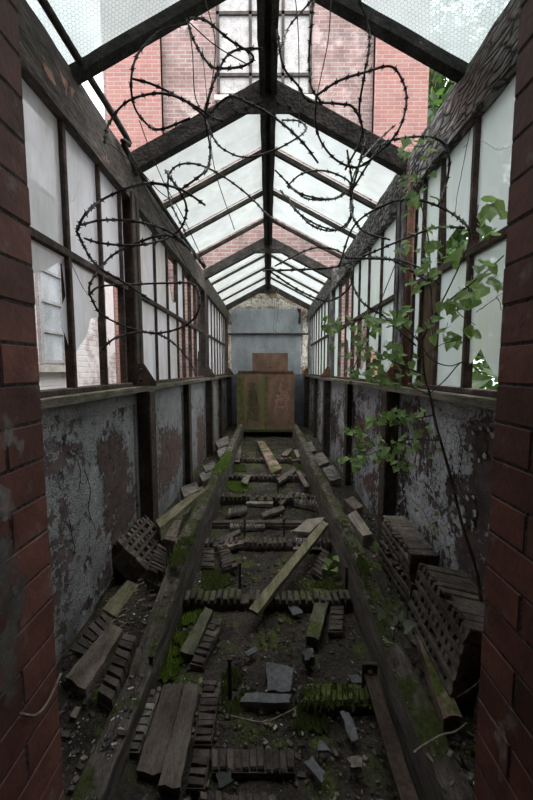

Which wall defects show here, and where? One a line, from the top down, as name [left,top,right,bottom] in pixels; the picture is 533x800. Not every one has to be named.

peeling [80,407,137,615]
peeling [157,422,185,499]
peeling [398,410,430,517]
peeling [442,467,478,532]